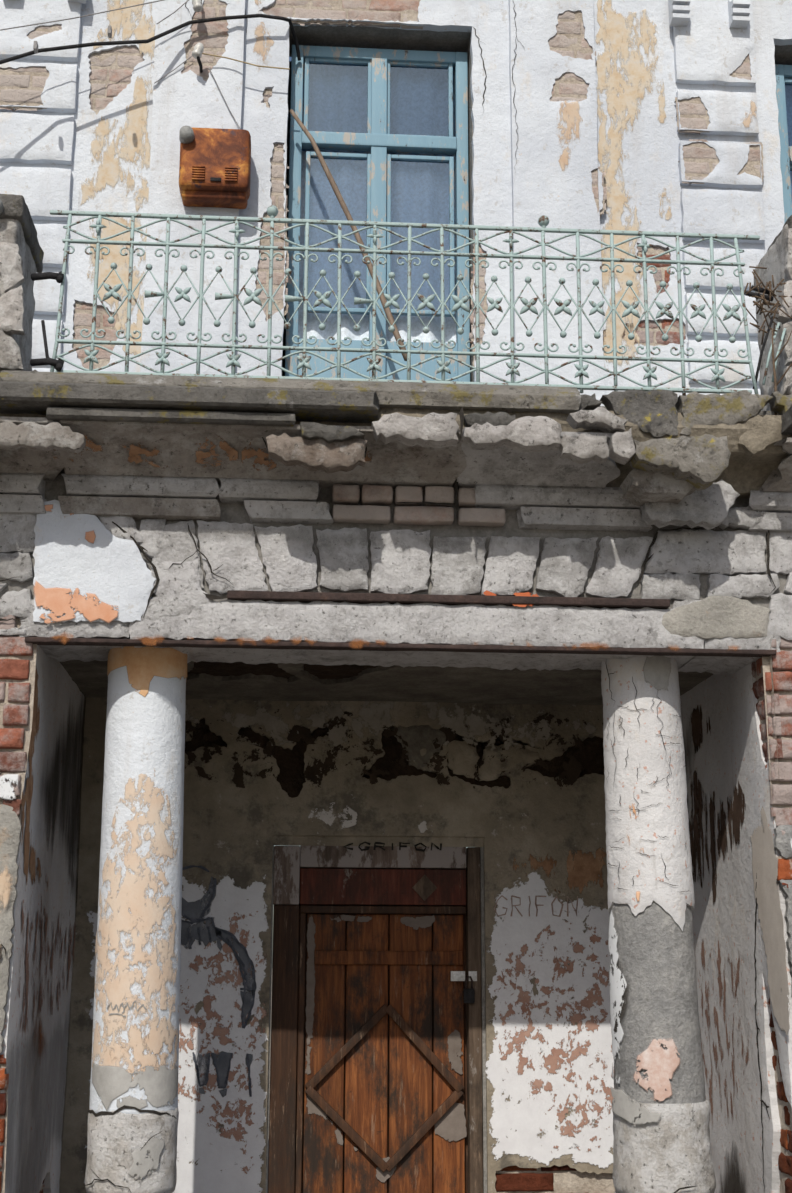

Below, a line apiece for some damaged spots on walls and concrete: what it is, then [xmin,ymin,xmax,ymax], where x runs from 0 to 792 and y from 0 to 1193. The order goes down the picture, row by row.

flaking render [181,0,229,82]
flaking render [253,0,423,61]
peeling [72,0,155,369]
flaking render [255,143,289,322]
peeling [548,0,719,365]
flaking render [737,142,764,182]
spalling [196,389,792,531]
peeling [34,581,118,624]
crack [112,521,232,621]
flaking render [0,615,46,885]
peeling [92,770,267,1174]
peeling [494,921,615,1193]